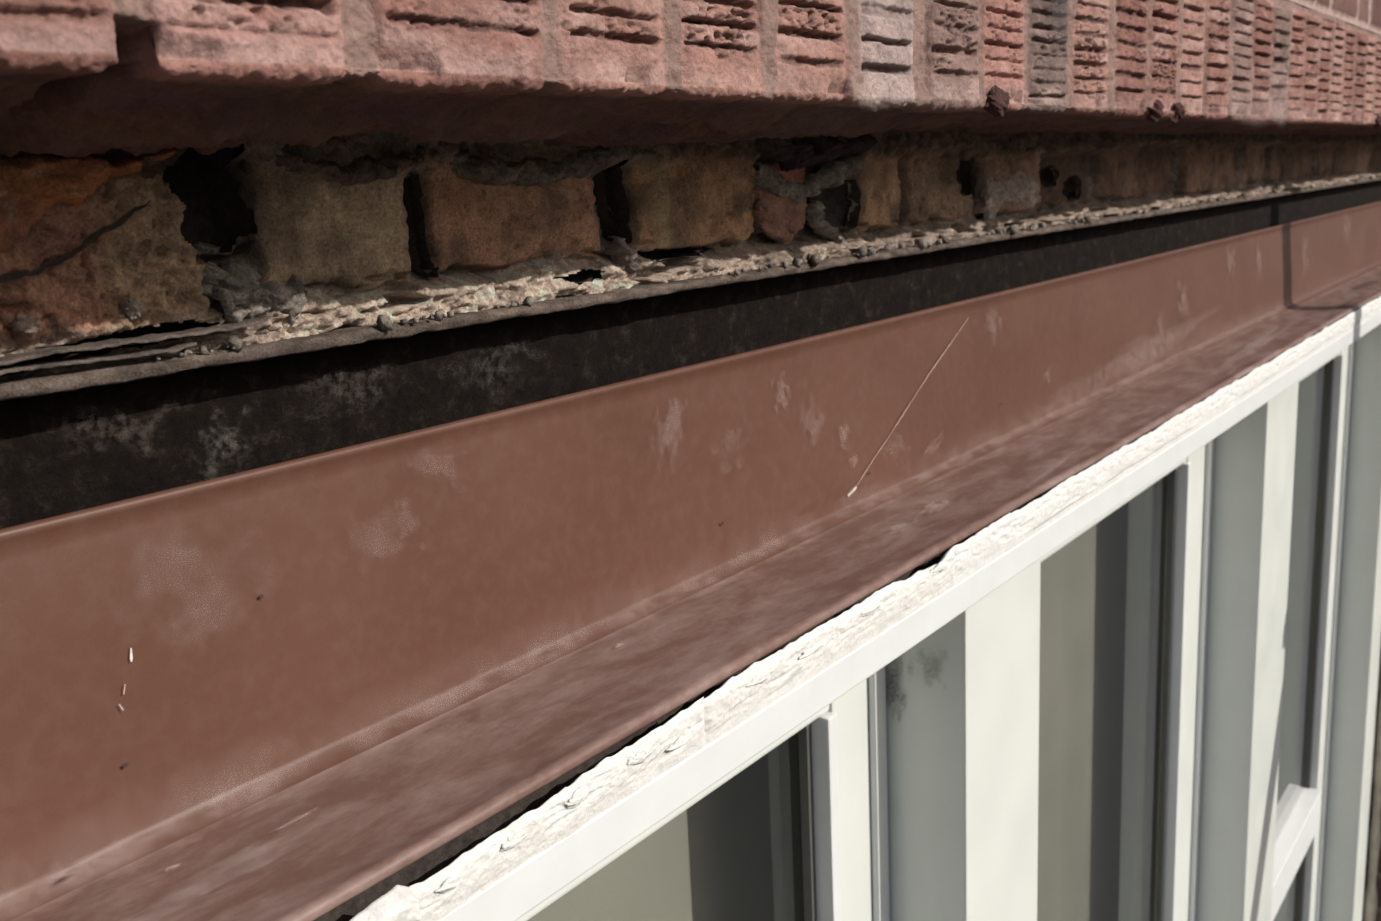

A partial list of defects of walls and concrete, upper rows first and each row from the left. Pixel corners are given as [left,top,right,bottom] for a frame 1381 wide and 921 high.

spalling [0,148,176,253]
spalling [753,192,807,245]
crack [0,200,151,282]
peeling [639,246,714,262]
peeling [553,269,601,283]
peeling [10,298,220,365]
peeling [929,560,949,576]
peeling [625,734,693,766]
peeling [564,785,590,809]
peeling [499,829,529,851]
peeling [434,871,468,894]